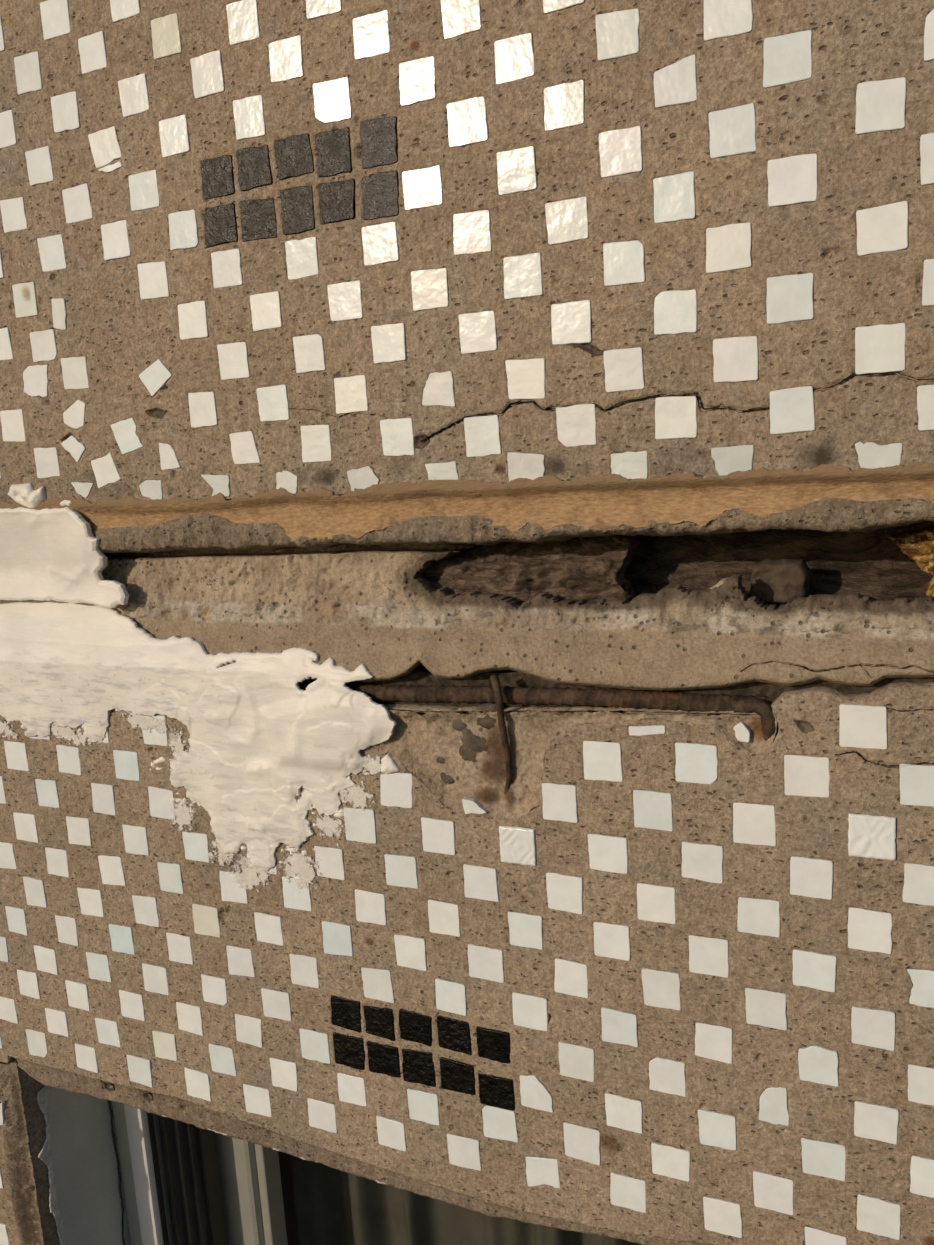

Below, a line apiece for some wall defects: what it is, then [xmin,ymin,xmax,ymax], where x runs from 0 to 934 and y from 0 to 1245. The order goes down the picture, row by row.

spalling [60,359,172,498]
spalling [556,404,596,447]
crack [421,393,770,442]
spalling [201,431,261,497]
spalling [507,452,545,482]
spalling [611,451,648,479]
spalling [711,445,754,476]
spalling [855,442,903,469]
spalling [91,498,934,600]
rust [477,730,512,806]
spalling [345,675,778,820]
crack [839,751,934,773]